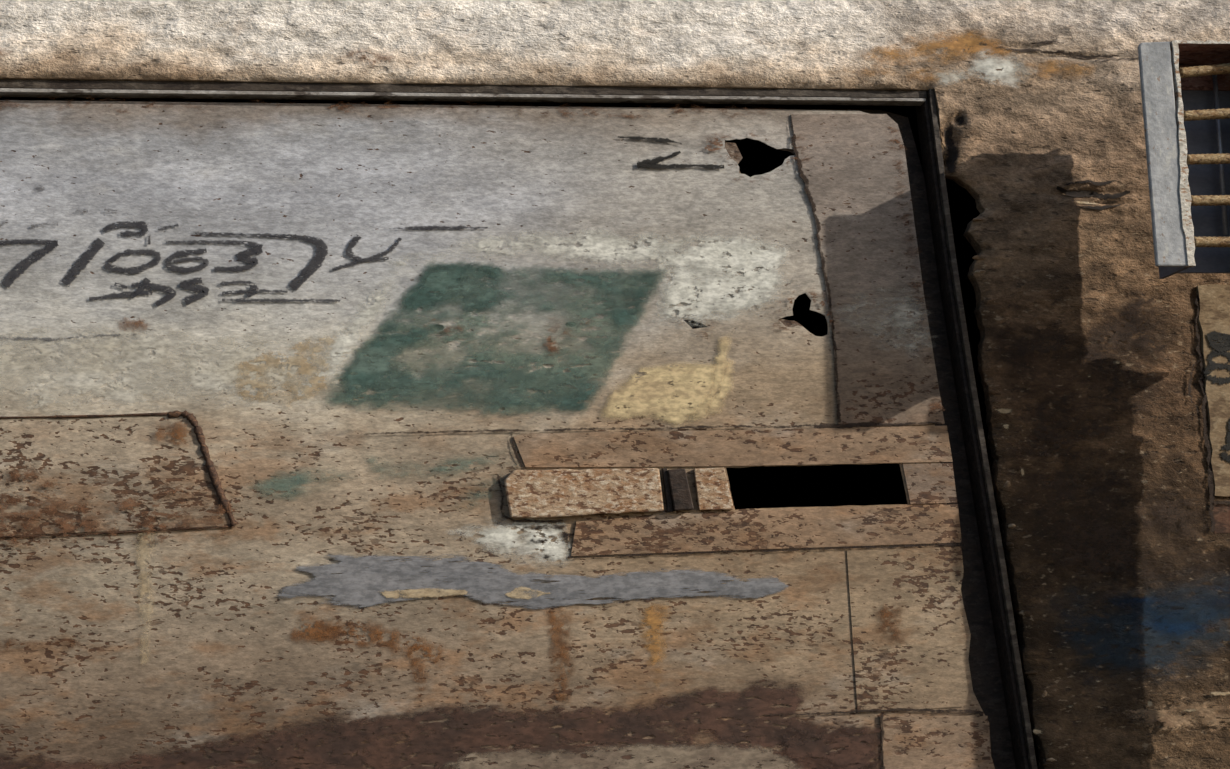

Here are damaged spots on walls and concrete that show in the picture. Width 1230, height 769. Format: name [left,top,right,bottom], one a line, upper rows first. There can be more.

spalling [0,97,924,177]
peeling [238,230,786,417]
spalling [781,293,828,337]
spalling [940,112,1032,647]
corrosion [0,465,235,546]
spalling [726,464,907,510]
peeling [382,588,467,599]
peeling [506,586,550,599]
corrosion [292,619,440,691]
peeling [0,680,882,769]
peeling [1128,692,1230,732]